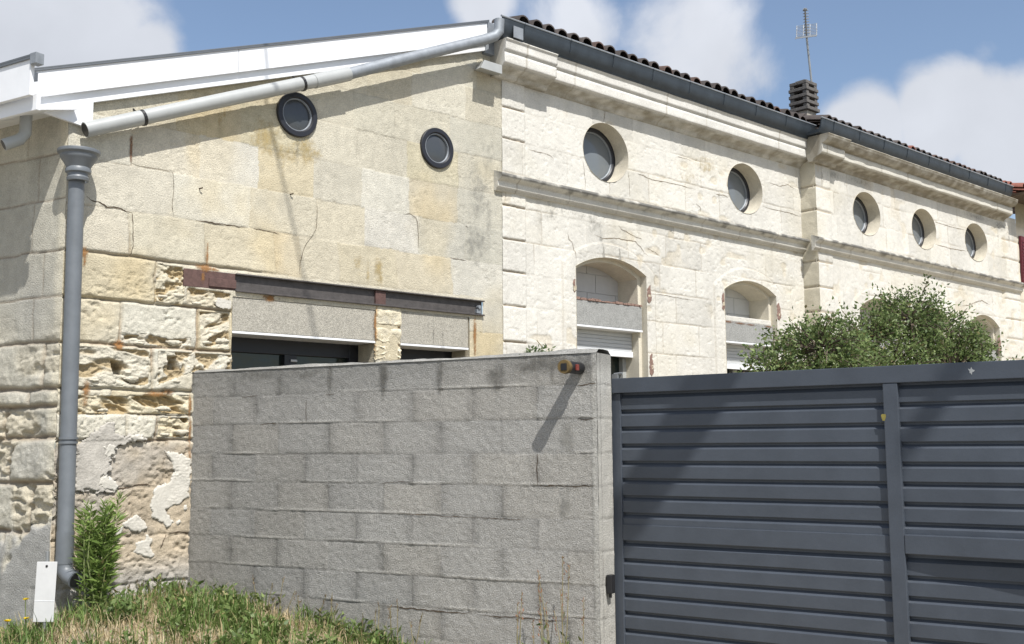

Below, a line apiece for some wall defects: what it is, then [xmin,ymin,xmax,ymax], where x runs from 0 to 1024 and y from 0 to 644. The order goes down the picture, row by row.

crack [89,198,134,255]
peeling [116,450,192,558]